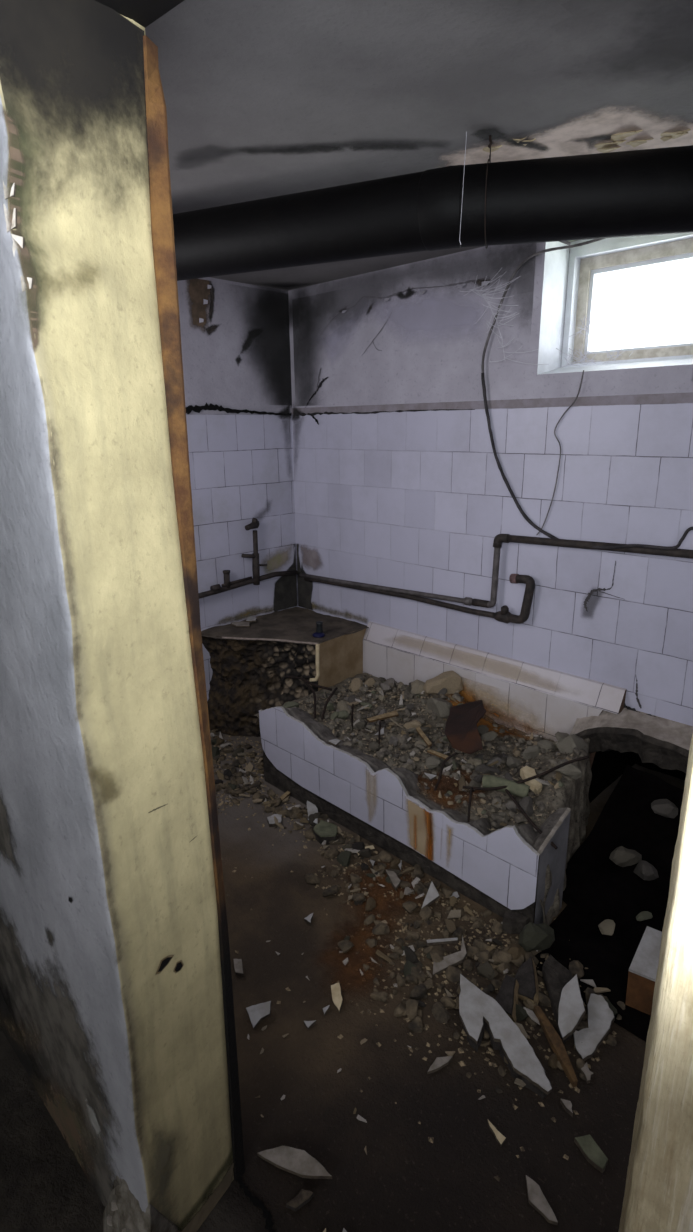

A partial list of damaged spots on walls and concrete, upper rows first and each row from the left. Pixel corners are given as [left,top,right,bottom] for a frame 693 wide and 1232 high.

peeling [442,108,693,166]
crack [186,368,475,425]
corrosion [445,684,534,754]
corrosion [407,772,483,861]